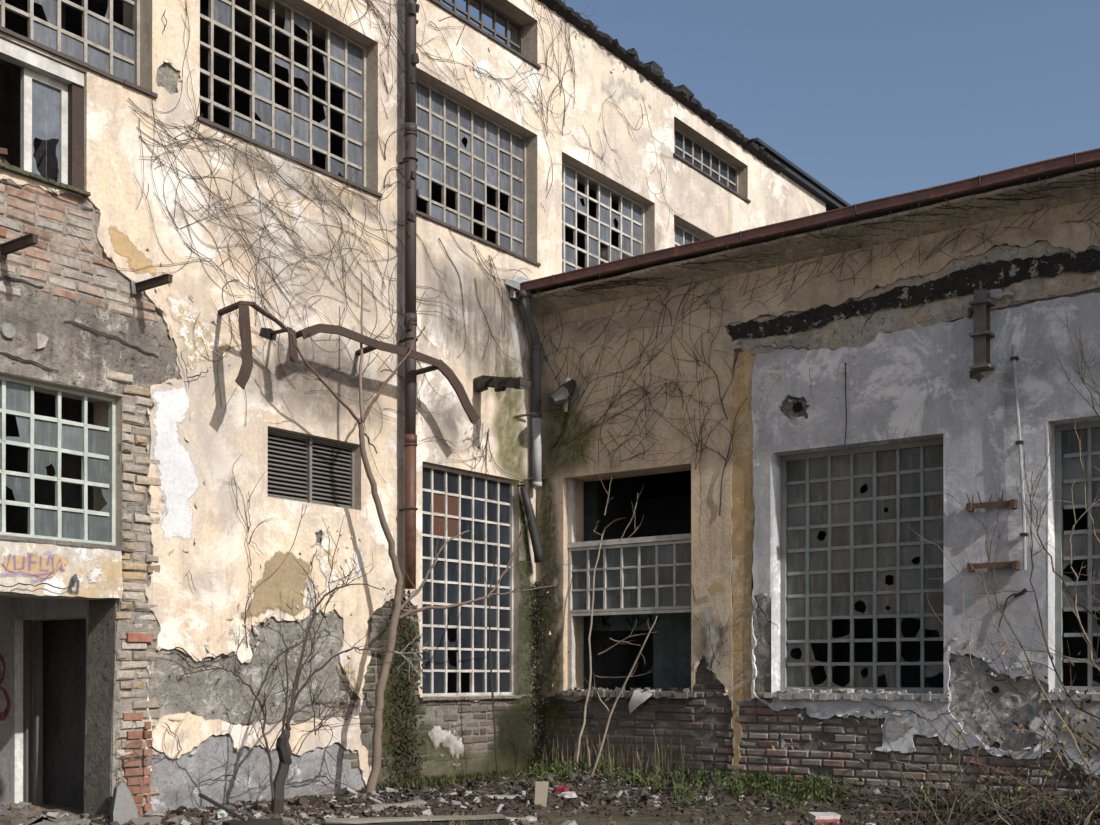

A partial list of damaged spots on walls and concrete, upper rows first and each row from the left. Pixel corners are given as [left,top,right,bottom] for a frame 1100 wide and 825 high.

flaking render [156,60,183,94]
flaking render [0,176,1100,817]